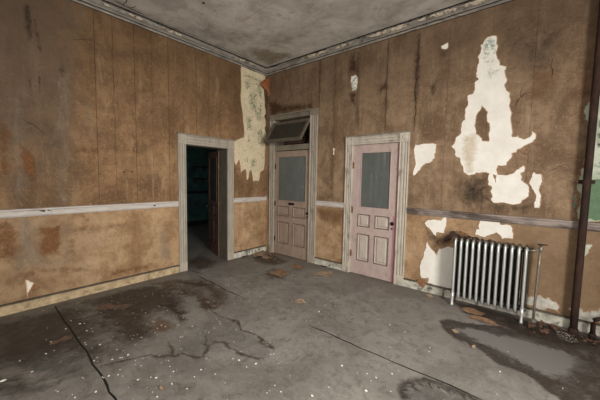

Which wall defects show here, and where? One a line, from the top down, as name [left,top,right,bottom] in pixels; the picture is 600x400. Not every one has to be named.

peeling [270,0,487,72]
flaking render [444,231,511,245]
crack [55,306,117,400]
leakage [0,280,225,374]
crack [312,326,482,400]
leakage [440,303,600,400]